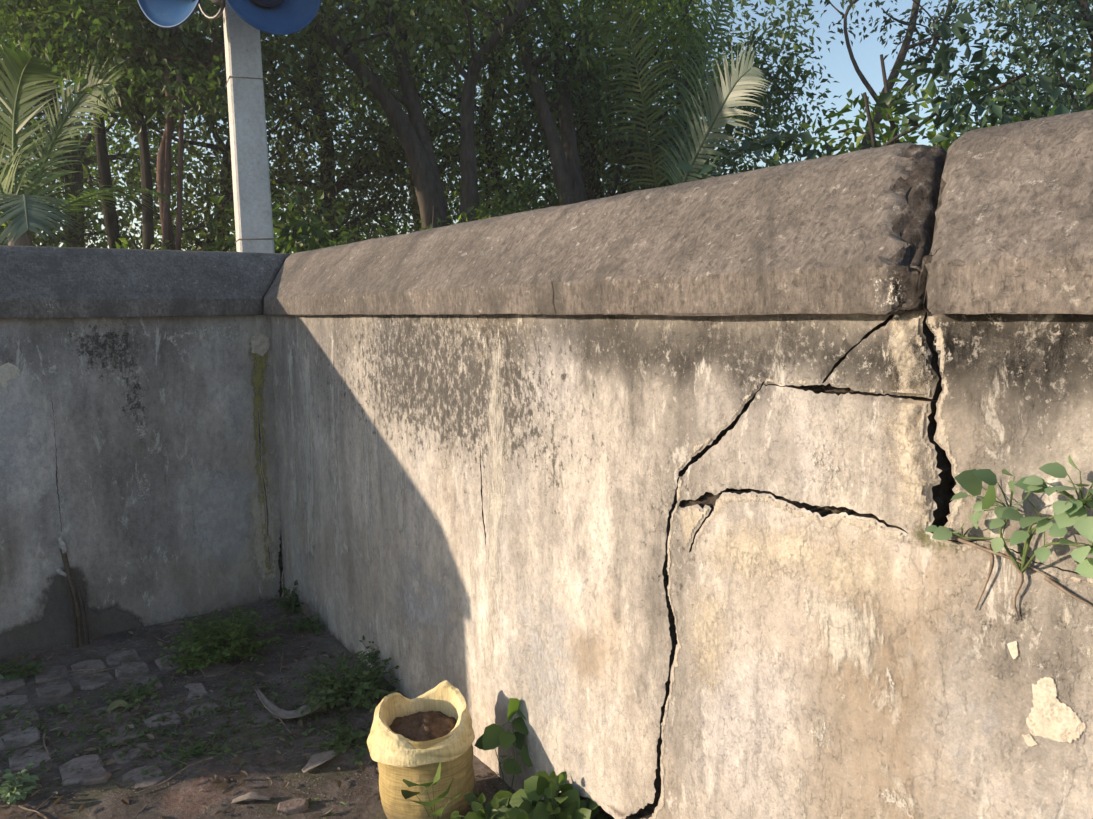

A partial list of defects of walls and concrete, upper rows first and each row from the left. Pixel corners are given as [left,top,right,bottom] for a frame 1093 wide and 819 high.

peeling [0,362,20,390]
water stain [70,330,140,408]
crack [625,312,1093,819]
water stain [0,567,144,659]
peeling [1007,641,1018,660]
peeling [1021,677,1086,747]